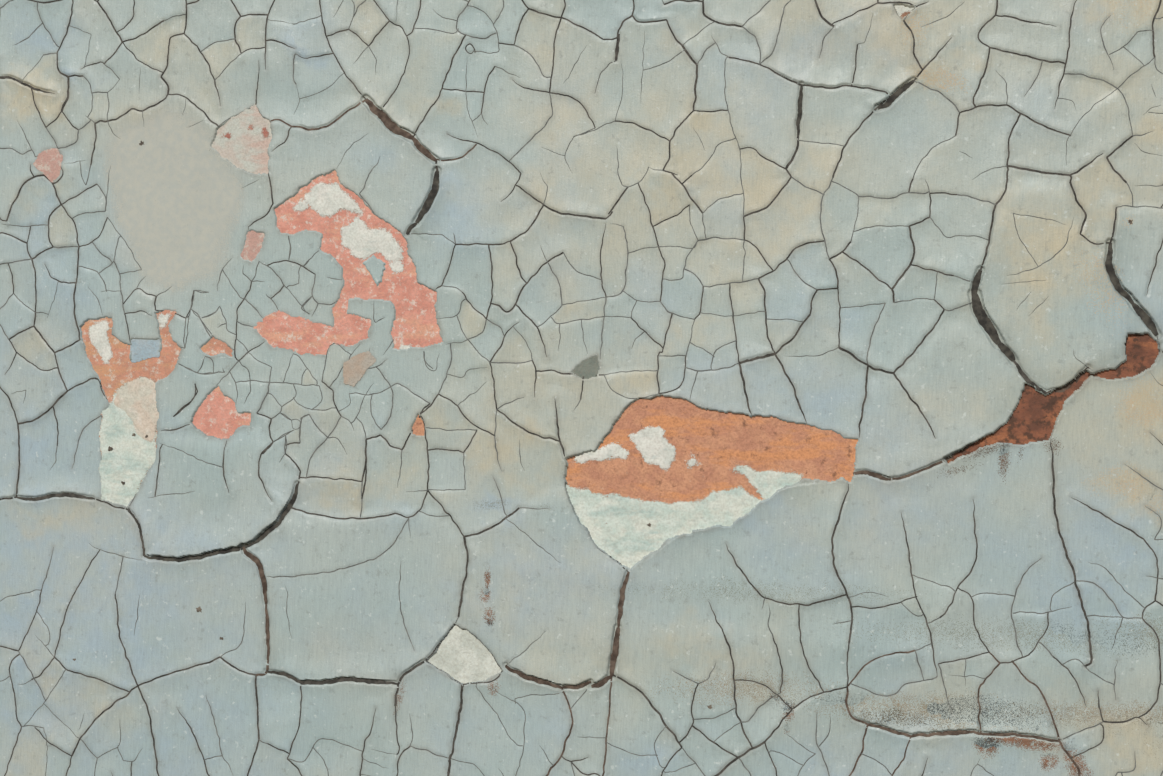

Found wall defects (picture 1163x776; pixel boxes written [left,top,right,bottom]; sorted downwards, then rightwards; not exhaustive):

peeling [33,148,63,182]
crack [0,0,295,185]
peeling [212,104,272,174]
peeling [254,170,443,387]
crack [173,0,1163,501]
peeling [81,310,181,507]
peeling [192,386,251,439]
crack [0,164,560,776]
peeling [566,395,858,569]
peeling [947,333,1159,463]
peeling [427,625,502,684]
crack [505,441,1163,776]